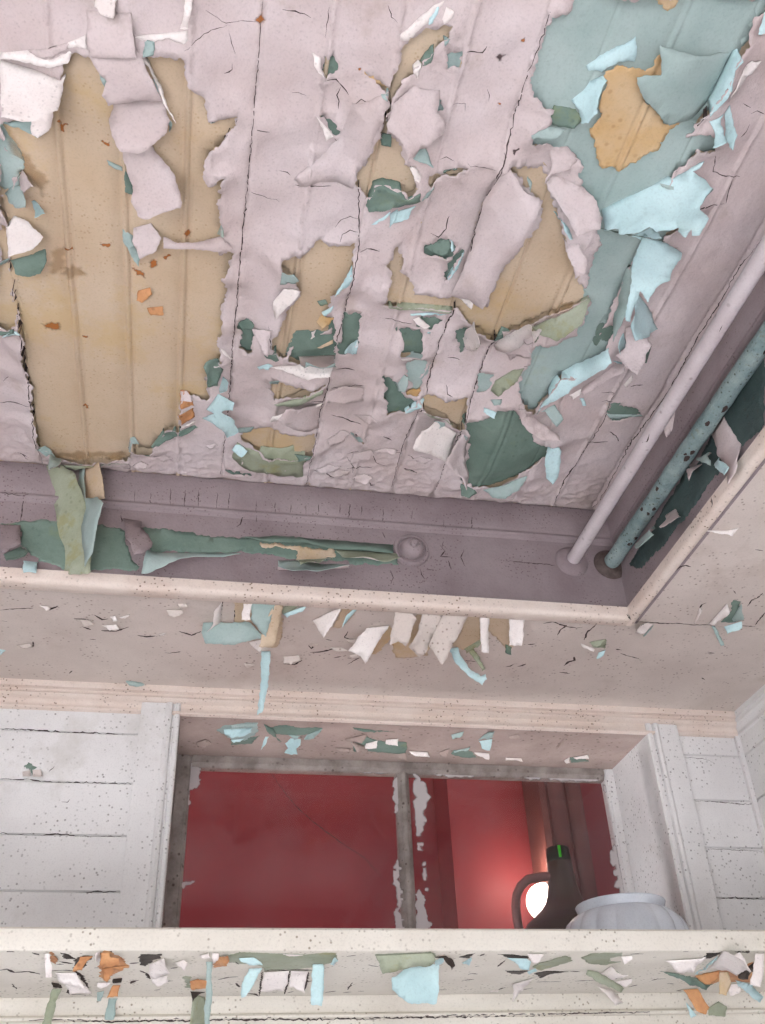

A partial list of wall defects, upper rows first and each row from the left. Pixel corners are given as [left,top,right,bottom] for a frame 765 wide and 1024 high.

crack [327,79,391,124]
peeling [294,1,464,227]
crack [442,15,549,252]
peeling [0,0,400,575]
crack [121,3,330,527]
crack [306,180,496,537]
crack [420,520,472,578]
peeling [382,0,765,499]
peeling [629,360,765,569]
peeling [196,602,524,755]
peeling [42,950,338,1024]
peeling [660,951,764,1018]